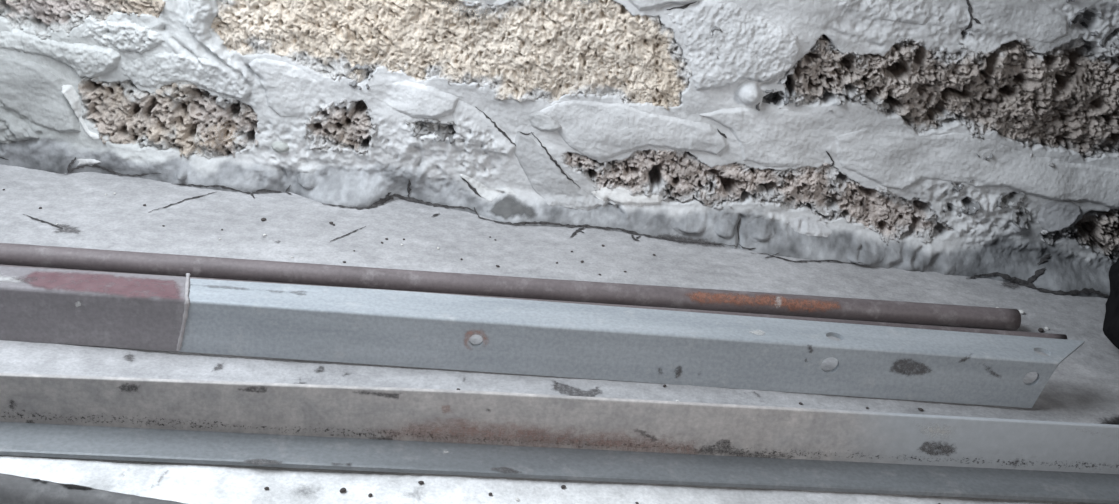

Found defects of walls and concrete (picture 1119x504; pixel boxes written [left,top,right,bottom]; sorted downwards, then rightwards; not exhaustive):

peeling [61,85,110,141]
spalling [349,64,373,90]
spalling [756,82,791,111]
crack [56,157,291,212]
peeling [591,184,663,207]
crack [322,178,862,264]
peeling [787,217,832,237]
crack [969,254,1109,298]